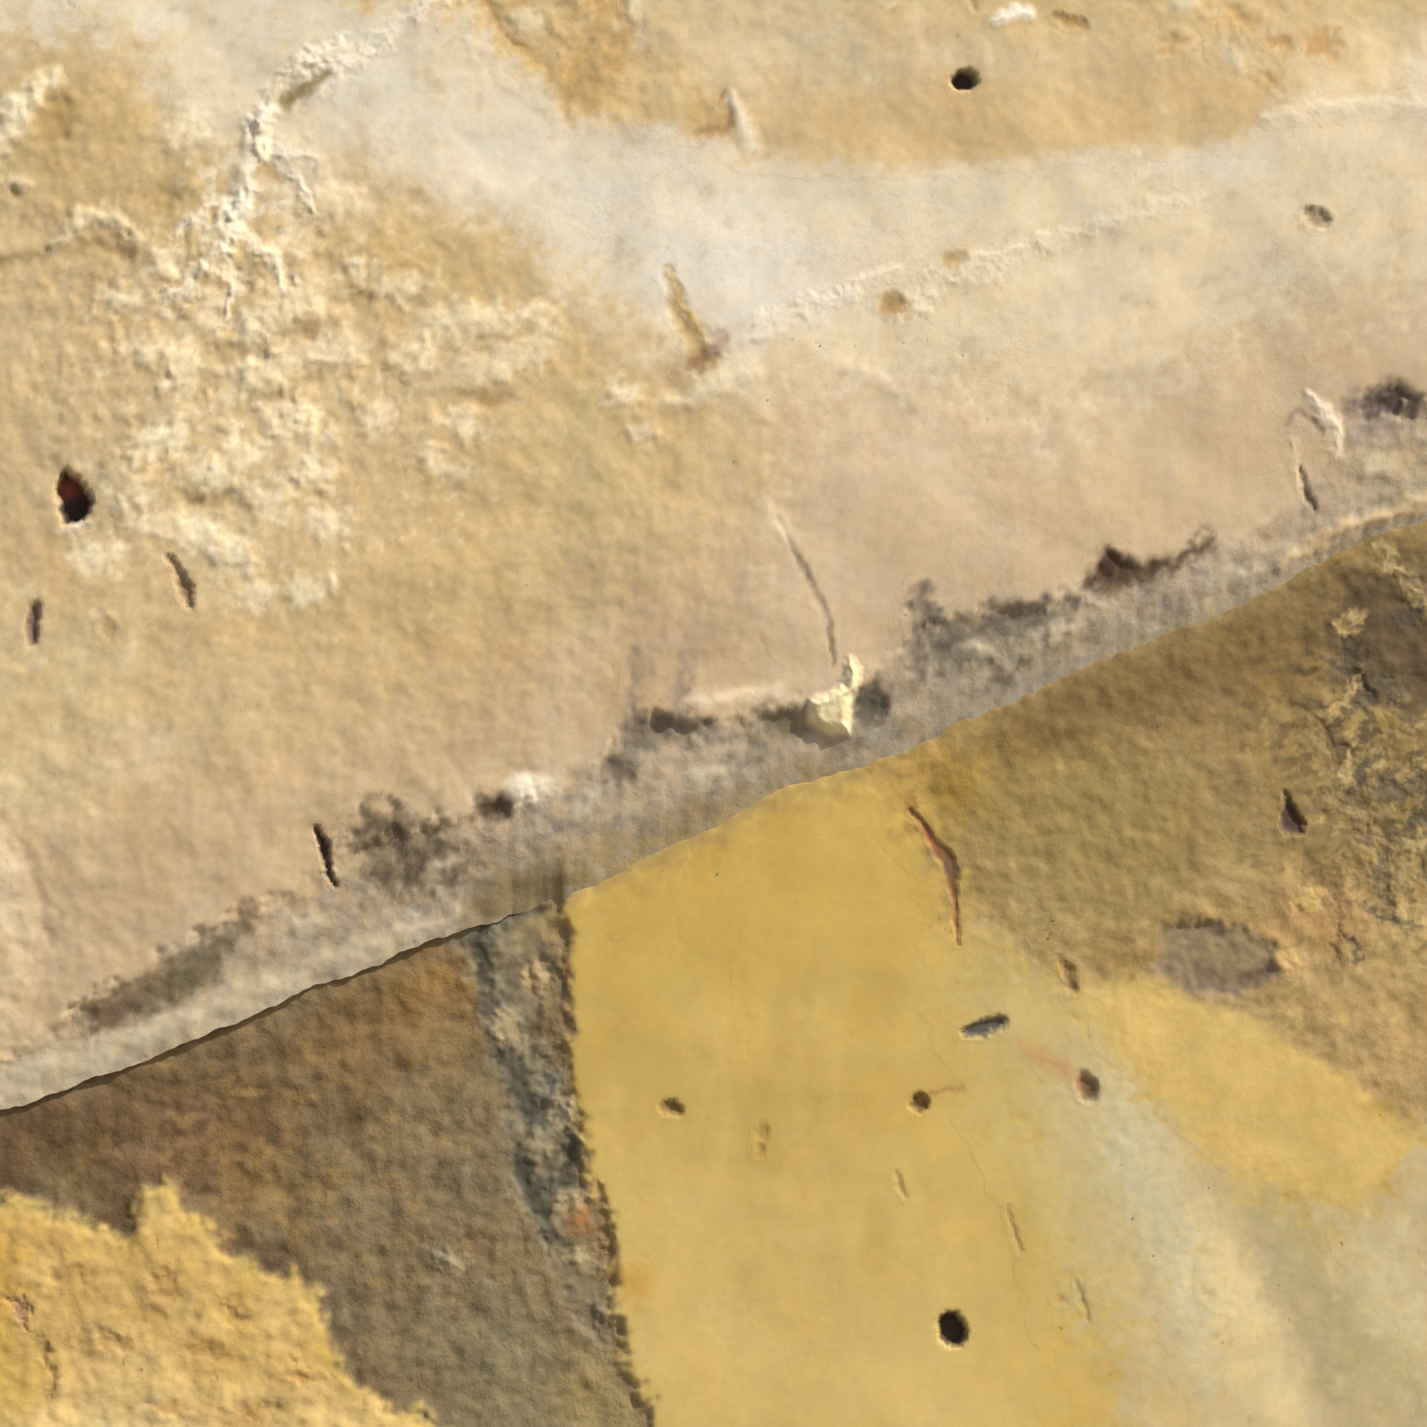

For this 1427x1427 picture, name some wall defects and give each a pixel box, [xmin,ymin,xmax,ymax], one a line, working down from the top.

water stain [0,305,1130,1063]
peeling [949,608,1087,670]
peeling [261,902,335,954]
peeling [416,848,477,886]
flaking render [490,766,618,828]
peeling [878,718,1019,931]
water stain [496,214,1427,1427]
peeling [1015,520,1427,1120]
peeling [0,914,663,1427]